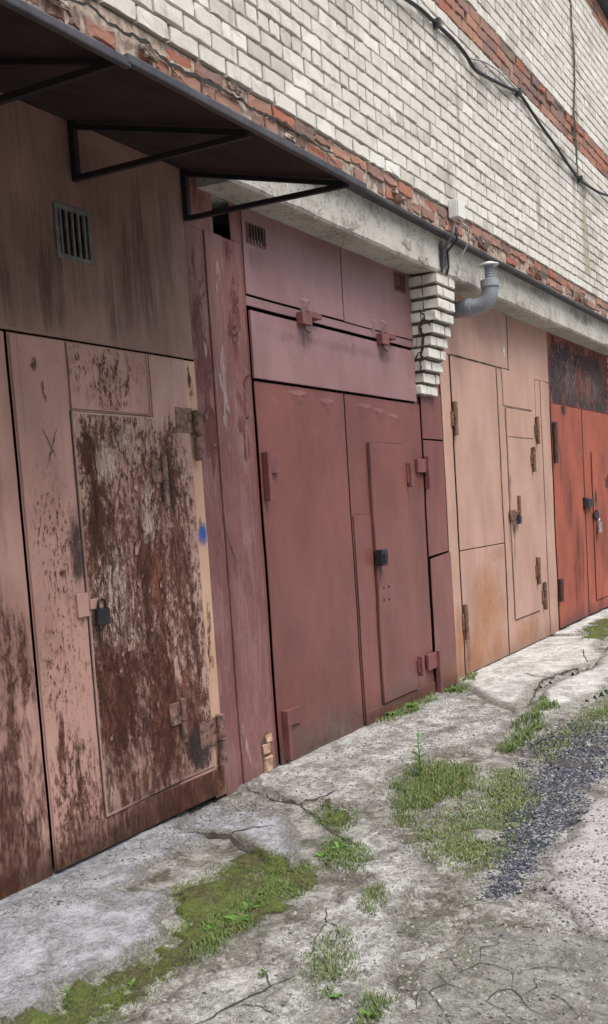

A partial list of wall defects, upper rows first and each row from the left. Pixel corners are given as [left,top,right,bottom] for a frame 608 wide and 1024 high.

corrosion [68,343,138,411]
corrosion [0,418,225,899]
crack [522,650,601,710]
crack [181,787,362,867]
crack [393,942,580,1024]